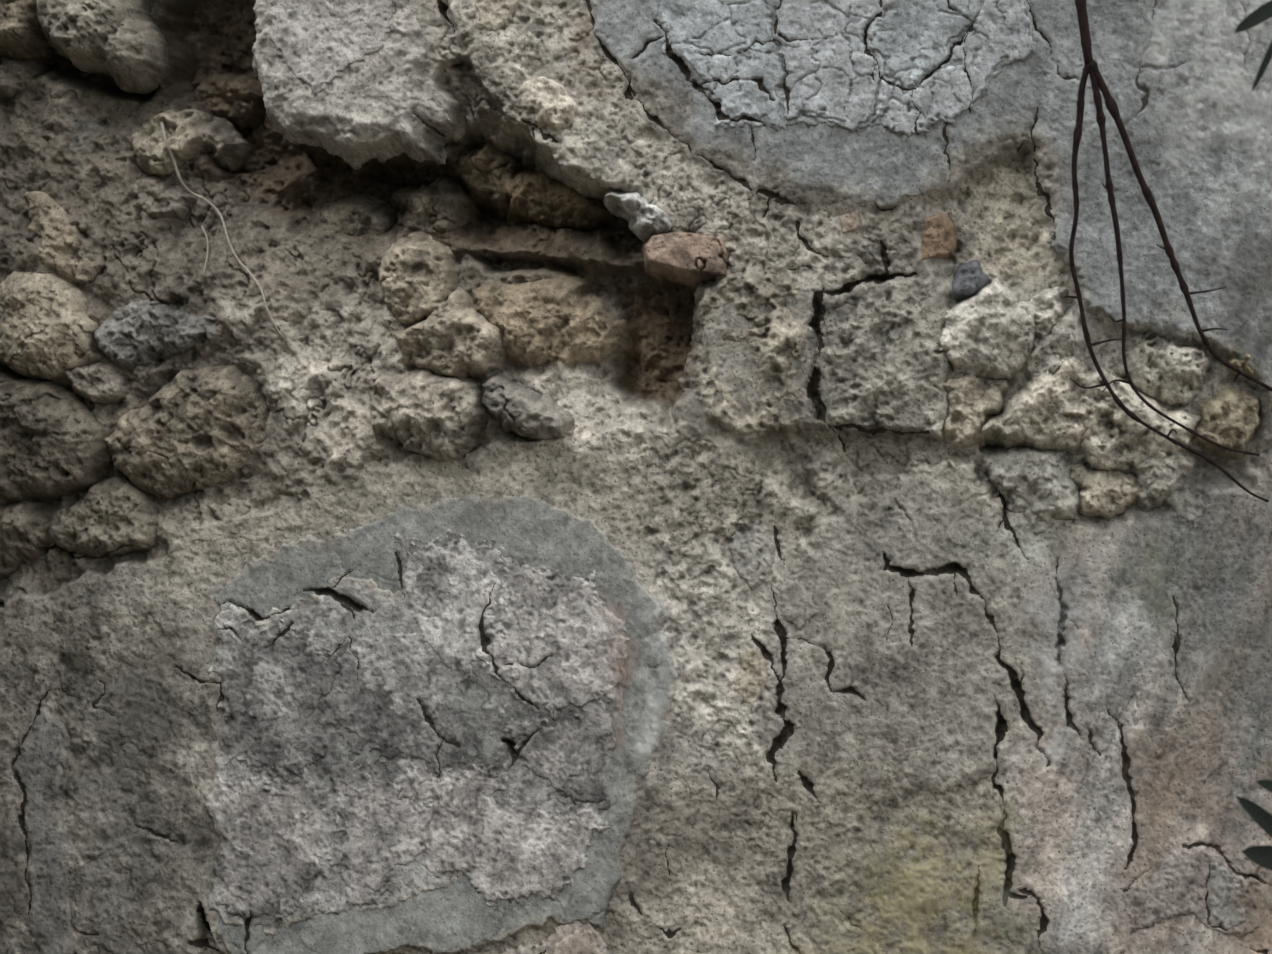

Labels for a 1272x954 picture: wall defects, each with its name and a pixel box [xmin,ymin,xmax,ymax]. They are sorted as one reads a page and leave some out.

crack [864,0,974,181]
crack [1026,0,1078,80]
crack [586,0,930,456]
flaking render [161,493,315,555]
crack [217,570,374,681]
crack [395,552,405,599]
crack [416,698,460,779]
crack [478,583,553,768]
crack [751,526,866,954]
crack [883,487,1151,954]
crack [1182,842,1268,954]